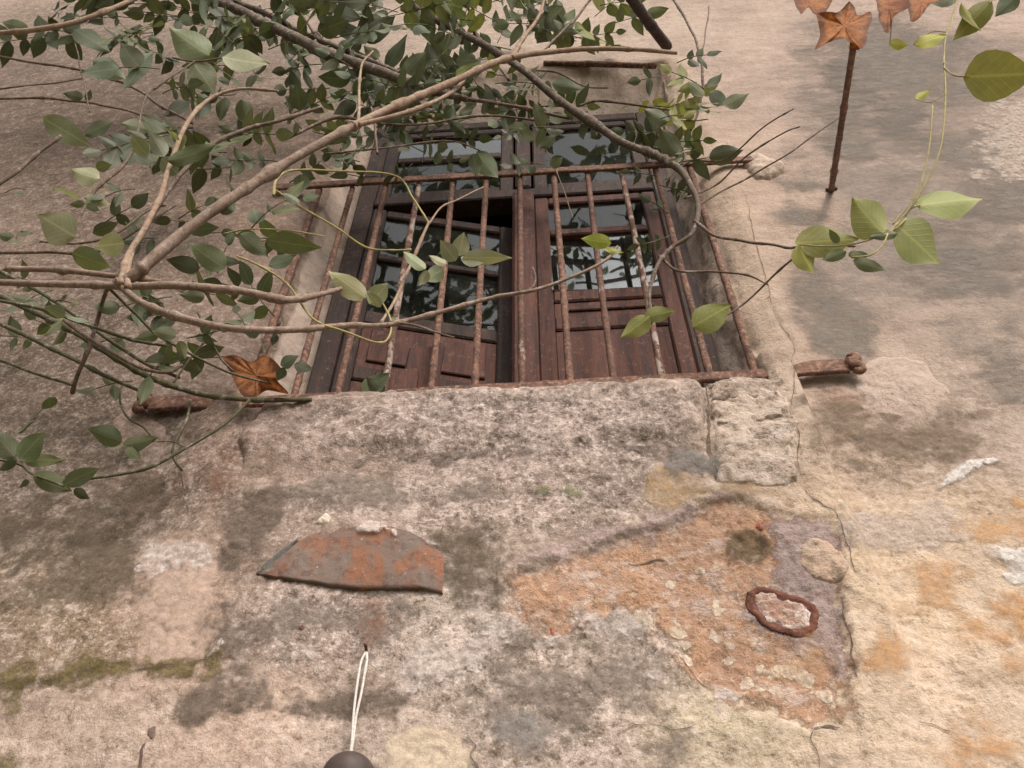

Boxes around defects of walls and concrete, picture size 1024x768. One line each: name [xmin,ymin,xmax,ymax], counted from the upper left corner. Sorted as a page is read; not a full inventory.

crack [744,189,856,573]
crack [842,600,858,678]